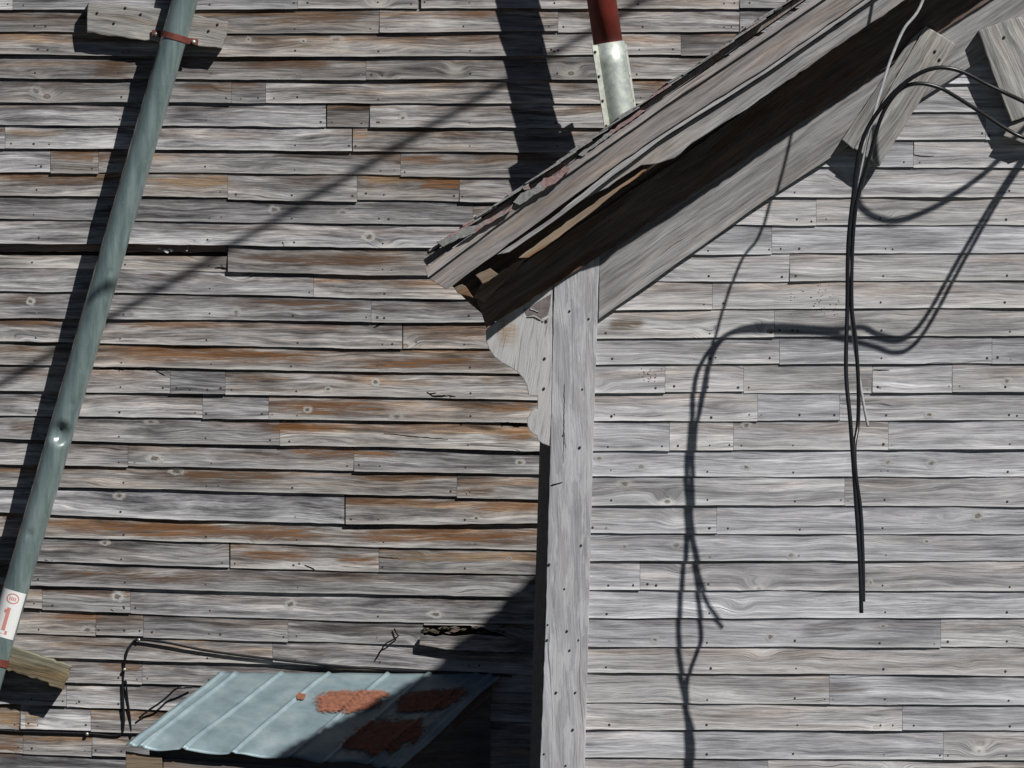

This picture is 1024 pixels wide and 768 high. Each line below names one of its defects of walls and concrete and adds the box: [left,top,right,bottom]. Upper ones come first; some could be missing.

peeling [422,626,487,634]
rust [296,687,467,756]